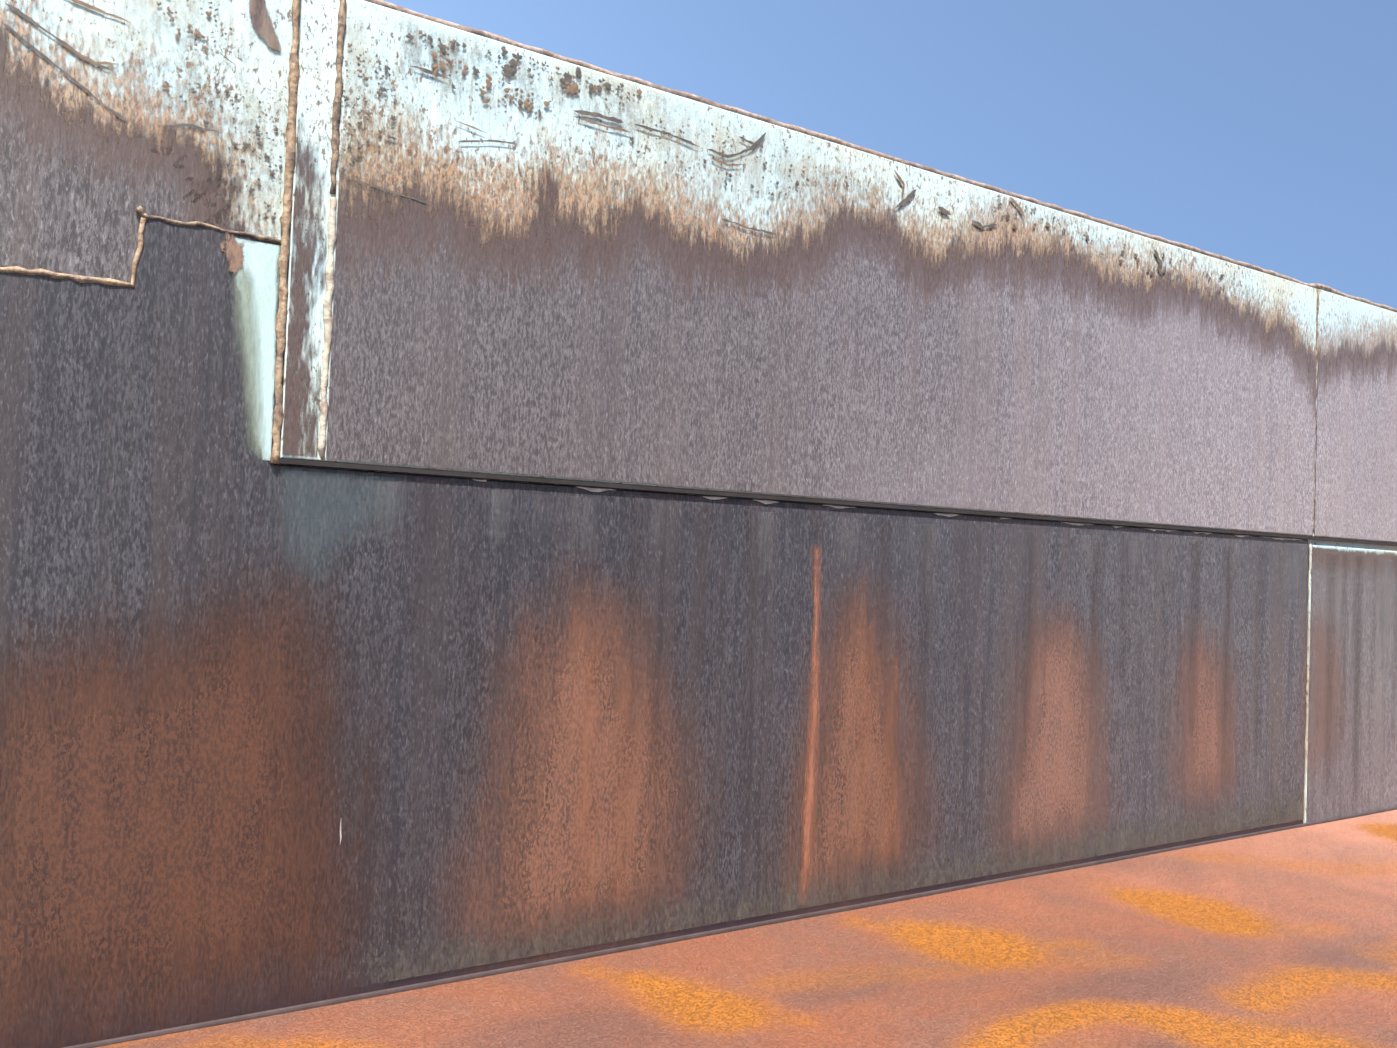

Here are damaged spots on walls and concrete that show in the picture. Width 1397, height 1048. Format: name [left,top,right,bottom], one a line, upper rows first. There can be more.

rust [0,0,267,283]
peeling [156,0,232,55]
peeling [161,81,283,220]
peeling [249,0,281,51]
peeling [339,43,397,172]
peeling [405,30,642,121]
peeling [664,127,859,199]
rust [281,113,1397,847]
rust [487,612,677,938]
rust [798,549,906,904]